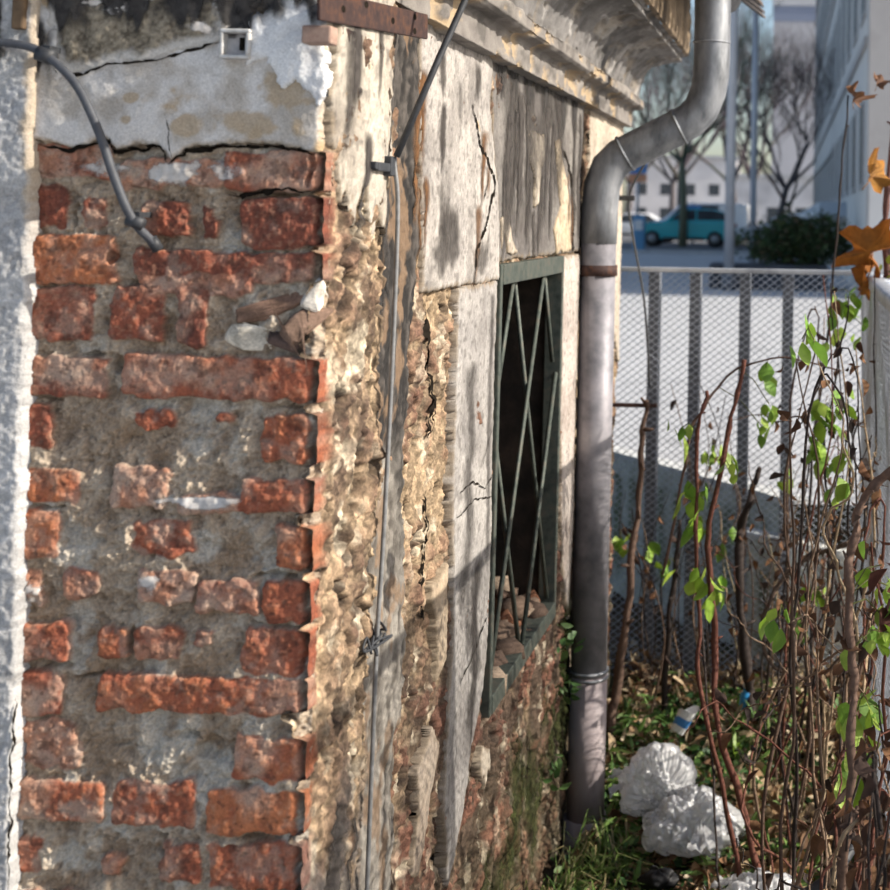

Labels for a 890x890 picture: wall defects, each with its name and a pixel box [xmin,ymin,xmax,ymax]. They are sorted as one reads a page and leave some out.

damp [38,0,317,47]
corrosion [302,0,428,46]
crack [39,113,313,164]
damp [435,187,459,275]
damp [477,247,488,272]
crack [473,106,496,286]
damp [496,63,582,259]
spalling [33,0,624,890]
crack [7,700,18,889]